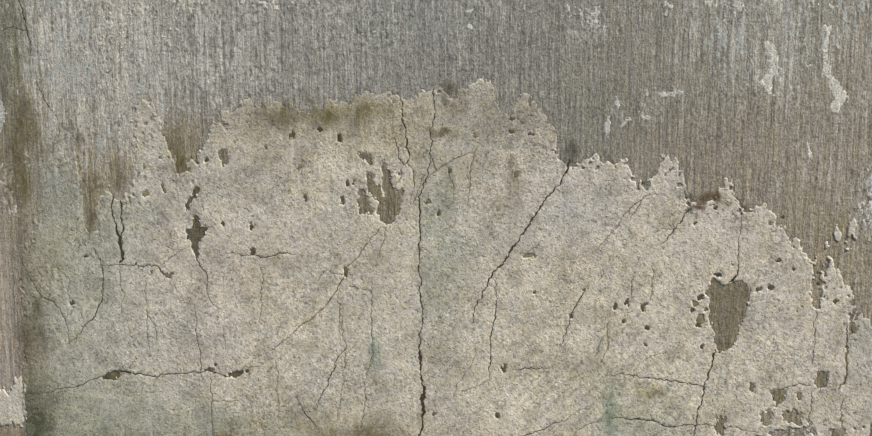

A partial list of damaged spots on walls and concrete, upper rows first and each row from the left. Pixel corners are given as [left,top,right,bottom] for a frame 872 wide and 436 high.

spalling [185,180,208,261]
crack [25,196,387,436]
spalling [340,151,404,225]
crack [394,87,476,436]
crack [453,158,571,398]
spalling [690,273,774,353]
crack [729,195,754,282]
spalling [103,370,121,380]
crack [509,325,756,436]
spalling [760,389,816,436]
spalling [814,371,828,390]
crack [839,326,849,427]